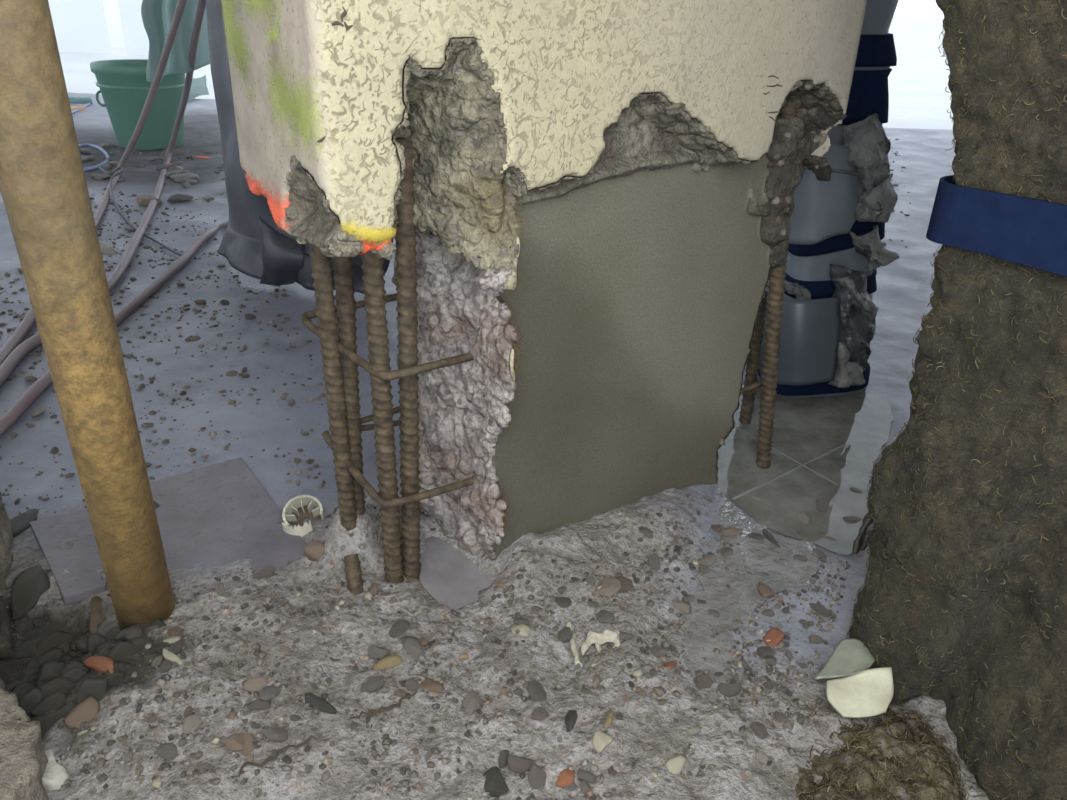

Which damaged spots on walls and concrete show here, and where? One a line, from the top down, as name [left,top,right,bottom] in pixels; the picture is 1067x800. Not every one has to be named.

spalling [285,37,847,560]